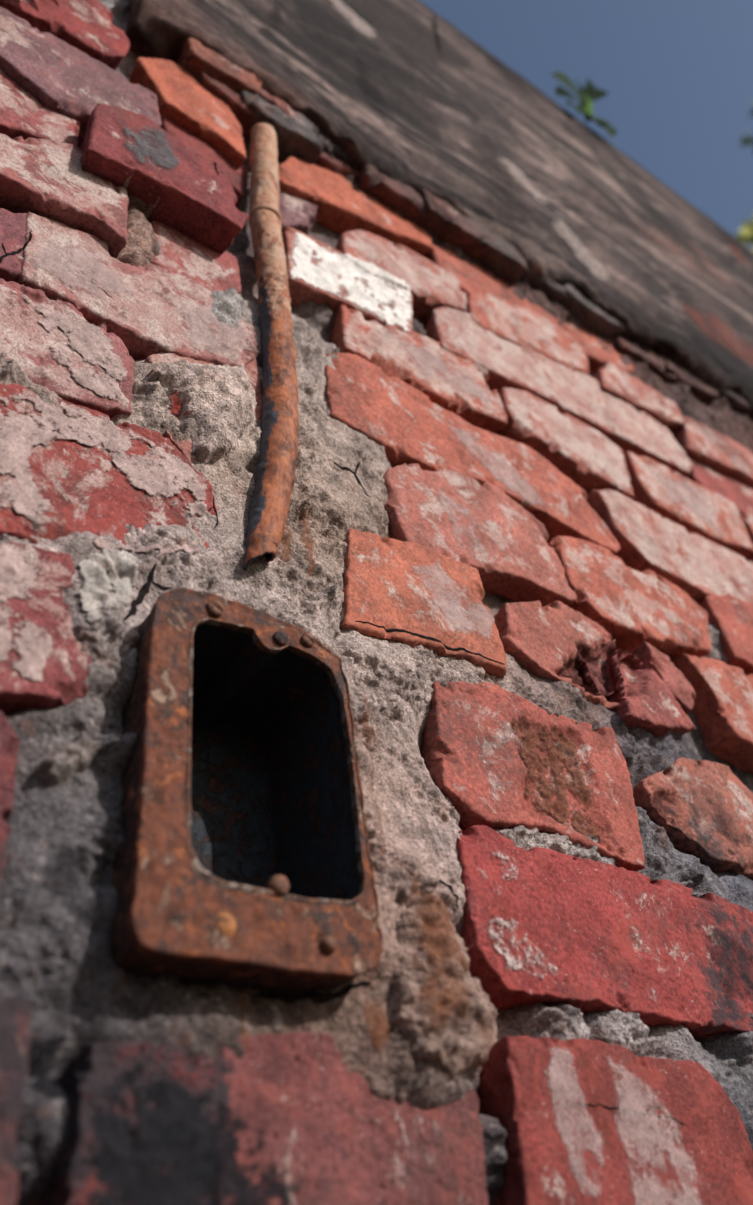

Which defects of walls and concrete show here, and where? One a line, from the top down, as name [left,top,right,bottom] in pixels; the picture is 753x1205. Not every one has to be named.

peeling [119,120,180,168]
crack [0,230,32,263]
peeling [290,232,490,400]
spalling [164,387,193,420]
peeling [0,393,207,526]
crack [334,461,371,497]
peeling [0,543,53,681]
crack [123,563,172,621]
crack [357,621,505,665]
spalling [558,639,696,738]
damp [26,1036,65,1099]
damp [78,1064,301,1205]